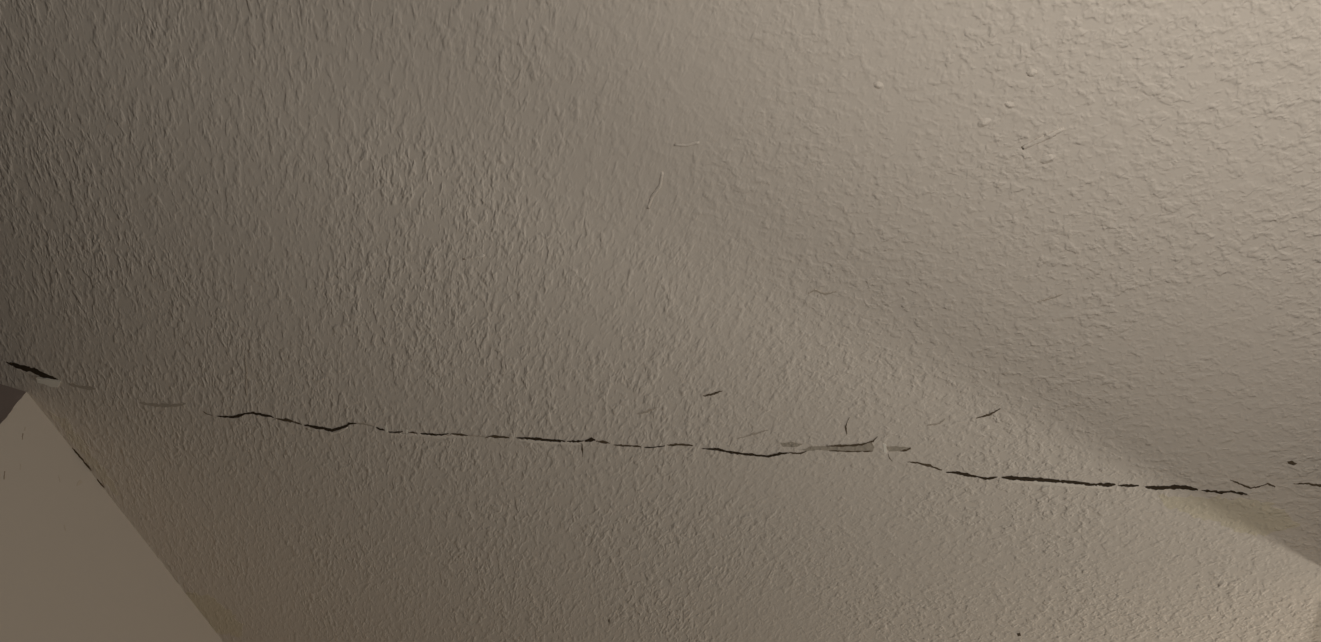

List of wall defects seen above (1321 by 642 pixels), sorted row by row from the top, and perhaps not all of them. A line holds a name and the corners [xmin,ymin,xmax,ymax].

crack [6,362,96,390]
crack [140,402,1321,495]